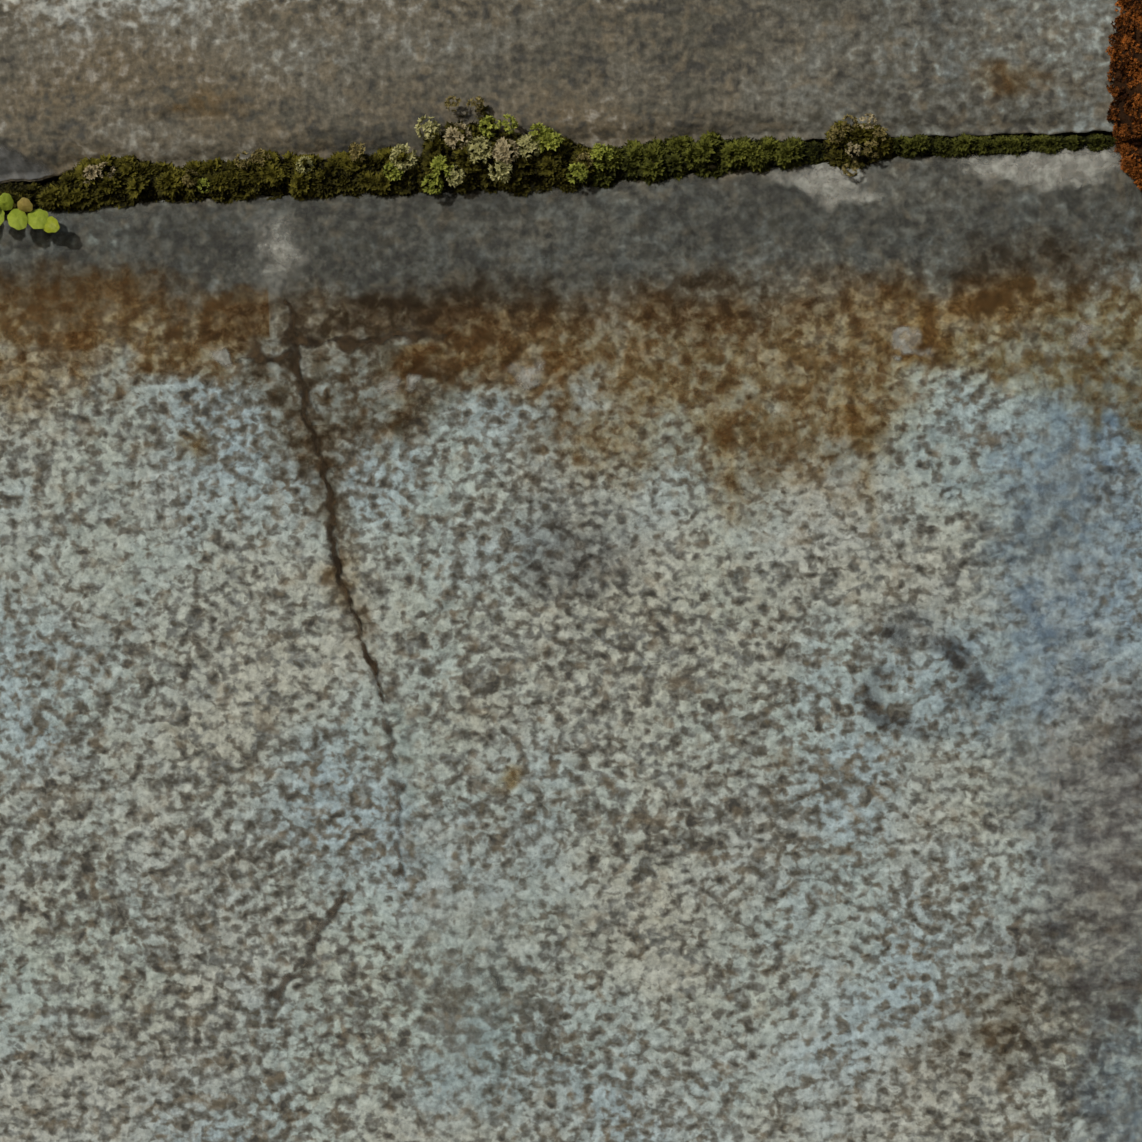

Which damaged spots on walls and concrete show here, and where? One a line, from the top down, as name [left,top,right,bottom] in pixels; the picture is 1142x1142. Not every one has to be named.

crack [236,300,446,879]
crack [264,890,345,1002]